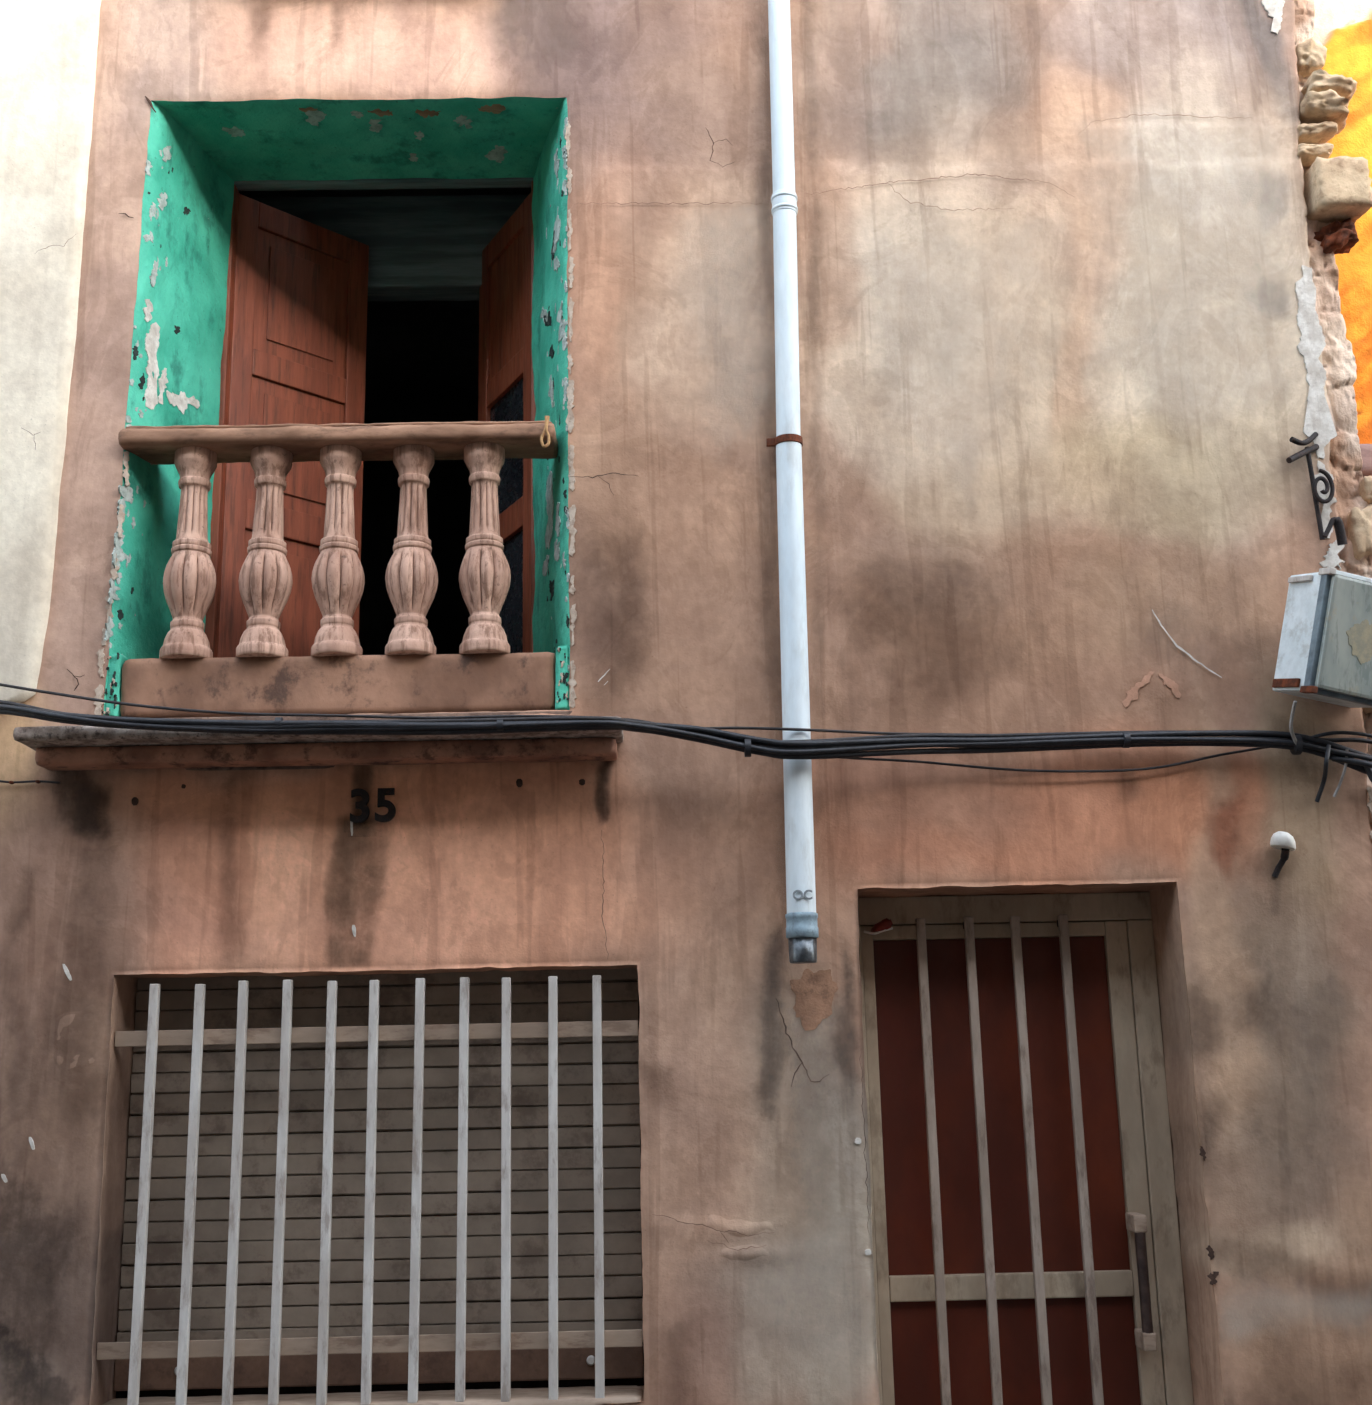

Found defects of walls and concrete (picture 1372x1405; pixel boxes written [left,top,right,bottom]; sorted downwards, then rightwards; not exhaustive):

flaking render [1261,0,1285,35]
peeling [299,107,327,126]
peeling [408,104,508,163]
crack [807,173,1074,211]
peeling [125,146,200,427]
peeling [541,117,577,708]
flaking render [1295,265,1345,570]
peeling [93,451,146,716]
leakage [329,765,376,920]
crack [776,999,829,1087]
flaking render [790,969,839,1031]
crack [859,1055,869,1232]